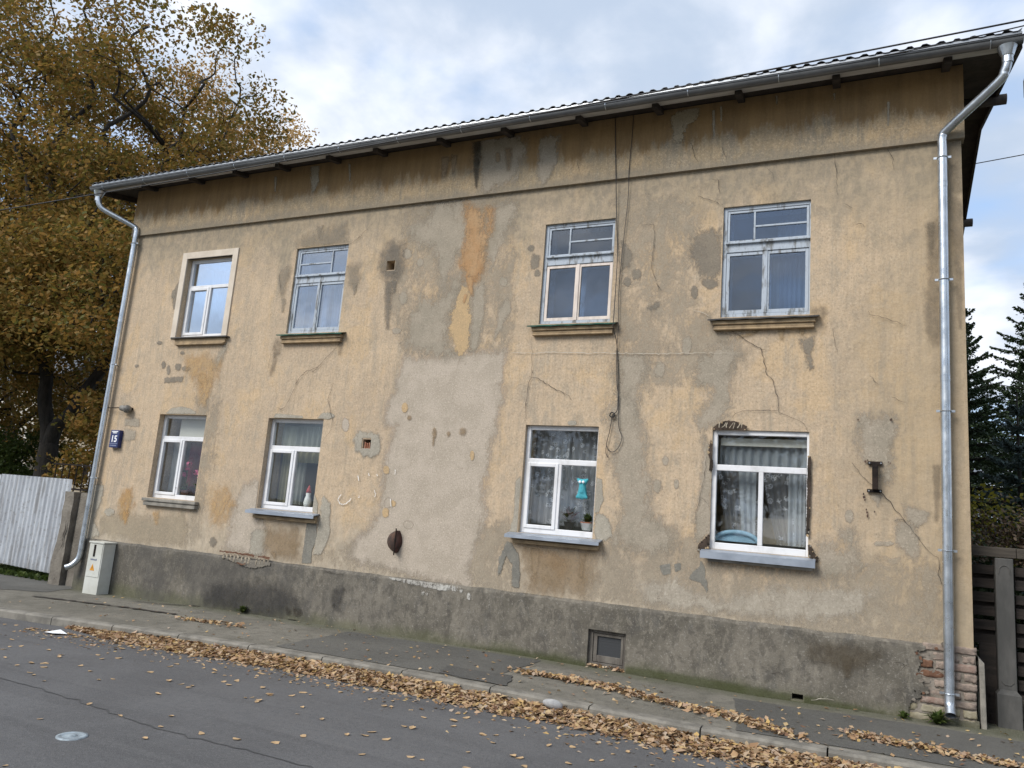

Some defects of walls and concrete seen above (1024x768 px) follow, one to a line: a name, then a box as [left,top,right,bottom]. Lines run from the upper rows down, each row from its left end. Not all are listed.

leakage [473,141,481,186]
leakage [381,244,403,327]
peeling [161,351,190,383]
crack [277,342,341,435]
peeling [318,135,560,600]
crack [513,331,807,429]
peeling [302,494,331,563]
peeling [594,352,871,620]
crack [852,463,942,584]
flaking render [878,637,978,722]